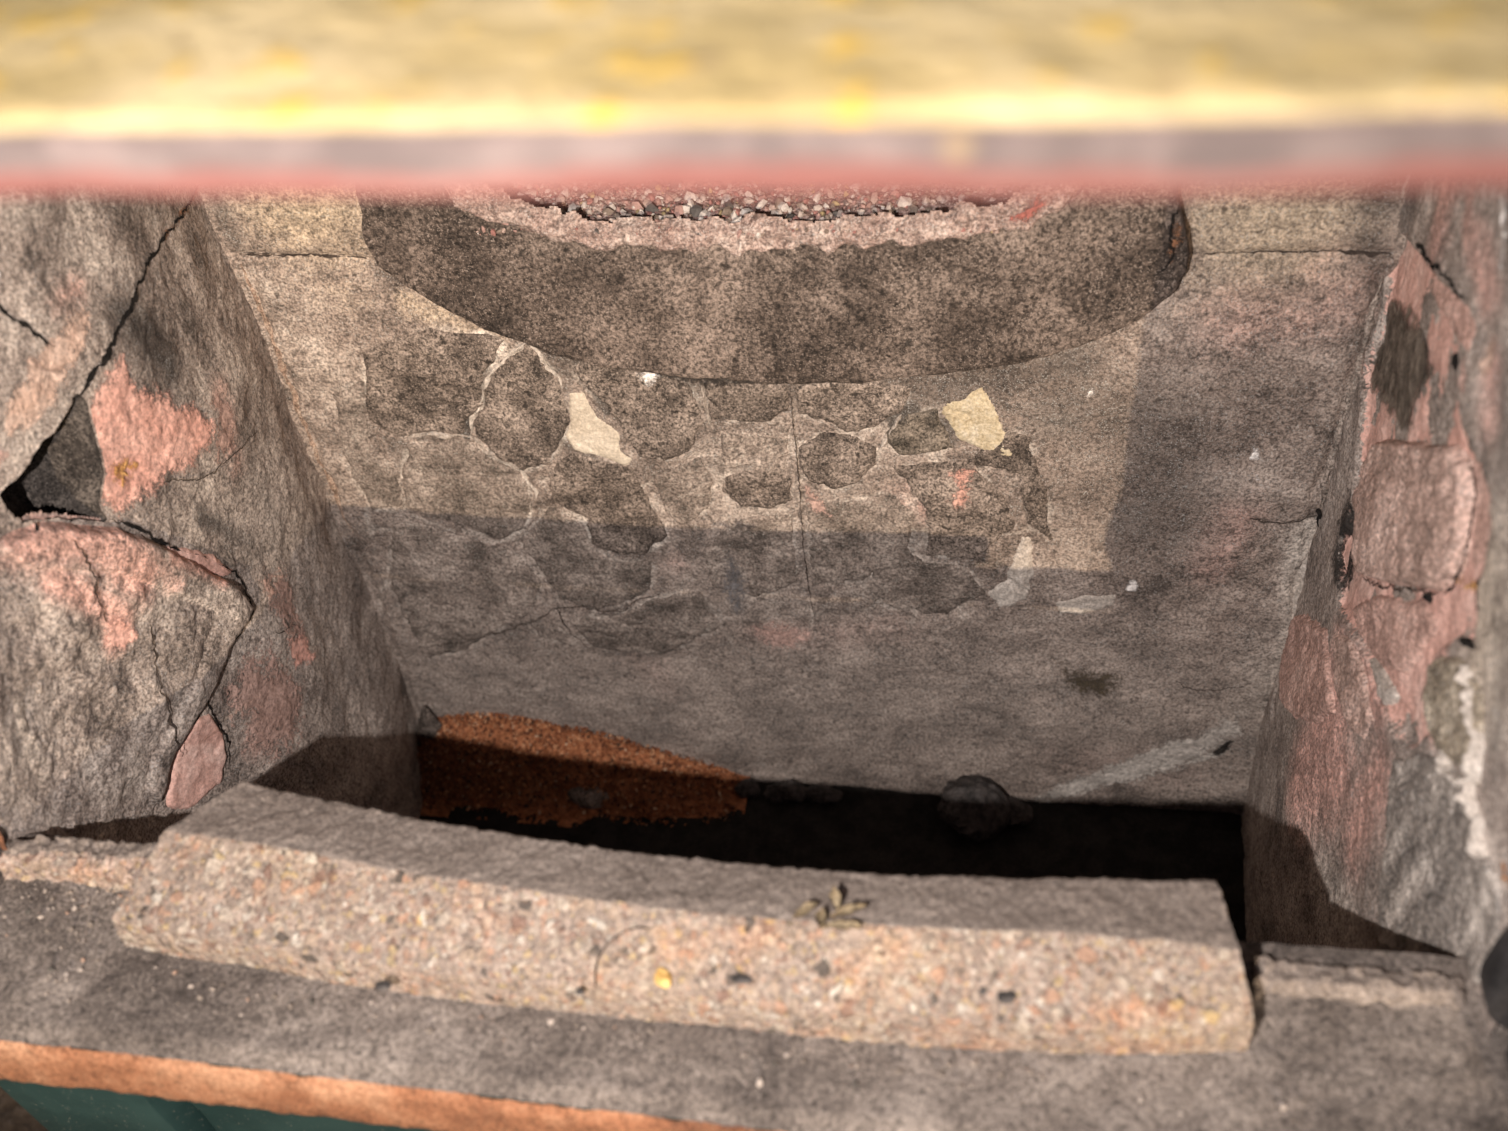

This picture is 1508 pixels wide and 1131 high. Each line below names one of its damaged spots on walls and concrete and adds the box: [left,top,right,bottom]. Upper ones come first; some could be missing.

crack [0,305,56,348]
crack [76,196,193,397]
spalling [0,354,236,524]
crack [159,431,257,483]
spalling [164,546,232,576]
efflorescence [1434,665,1490,858]